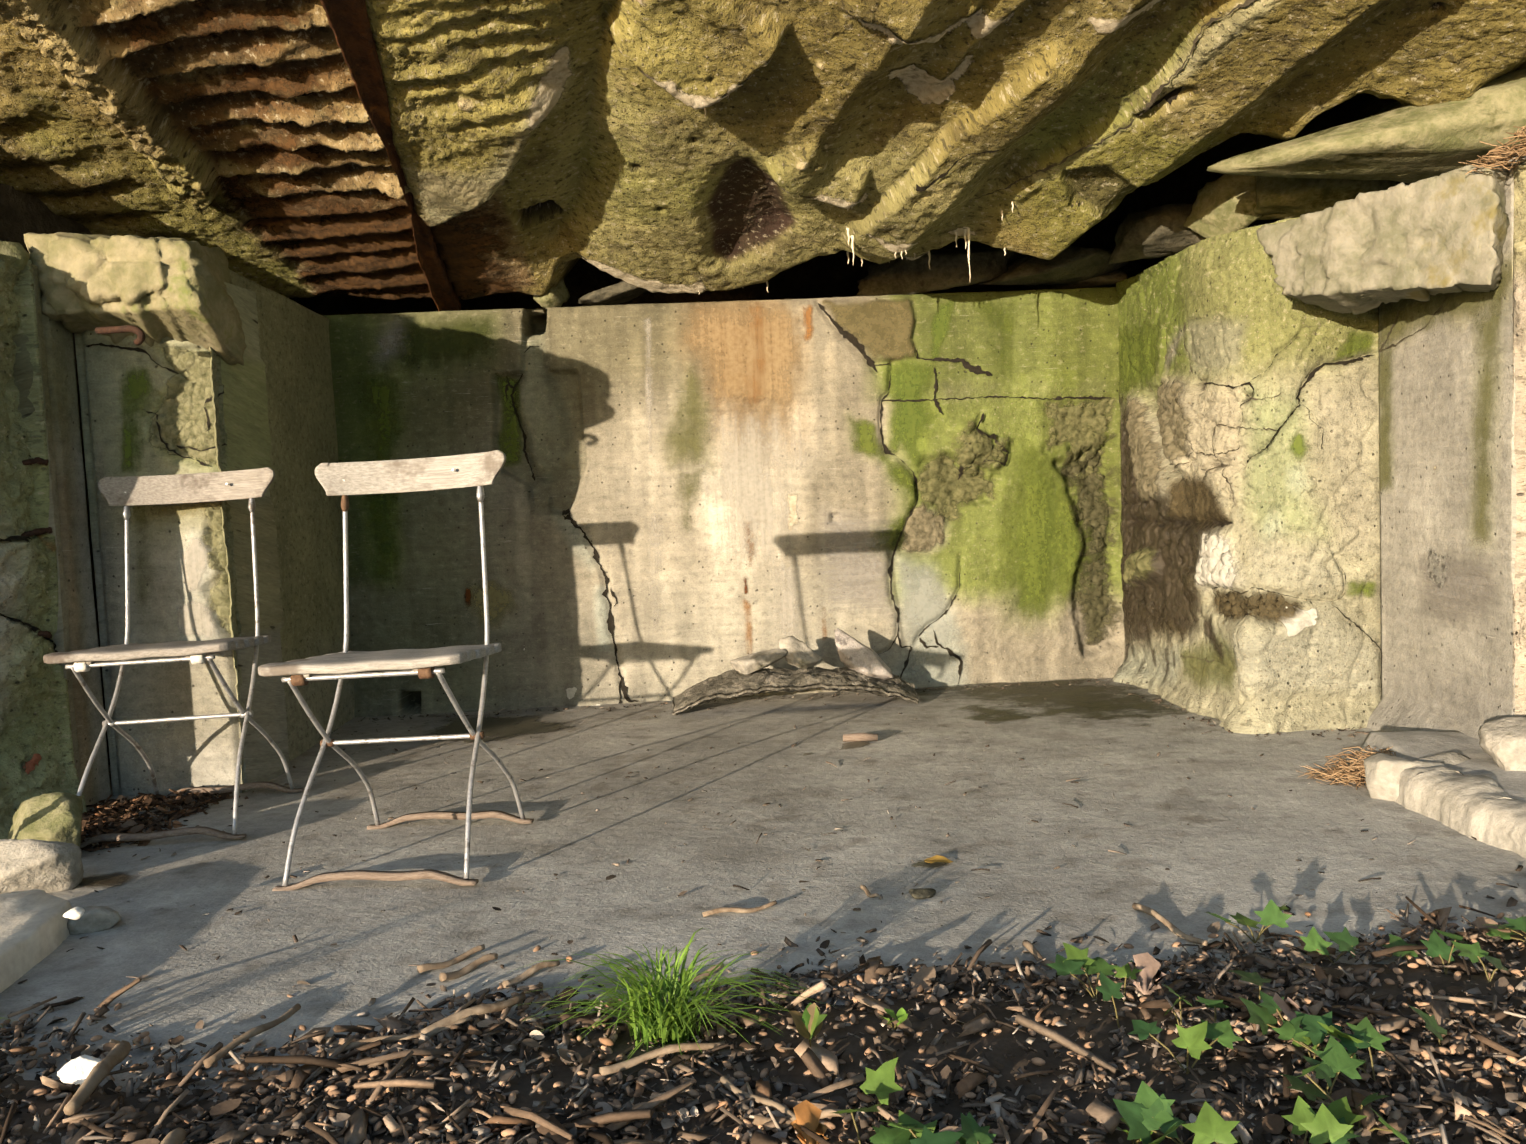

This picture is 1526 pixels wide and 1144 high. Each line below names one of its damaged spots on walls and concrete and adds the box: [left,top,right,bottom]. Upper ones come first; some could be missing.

water stain [579,255,705,294]
efflorescence [776,183,931,269]
water stain [948,227,975,279]
crack [146,385,227,466]
crack [1125,293,1451,528]
crack [818,303,1111,683]
water stain [1119,398,1236,682]
crack [562,509,638,704]
water stain [905,573,957,681]